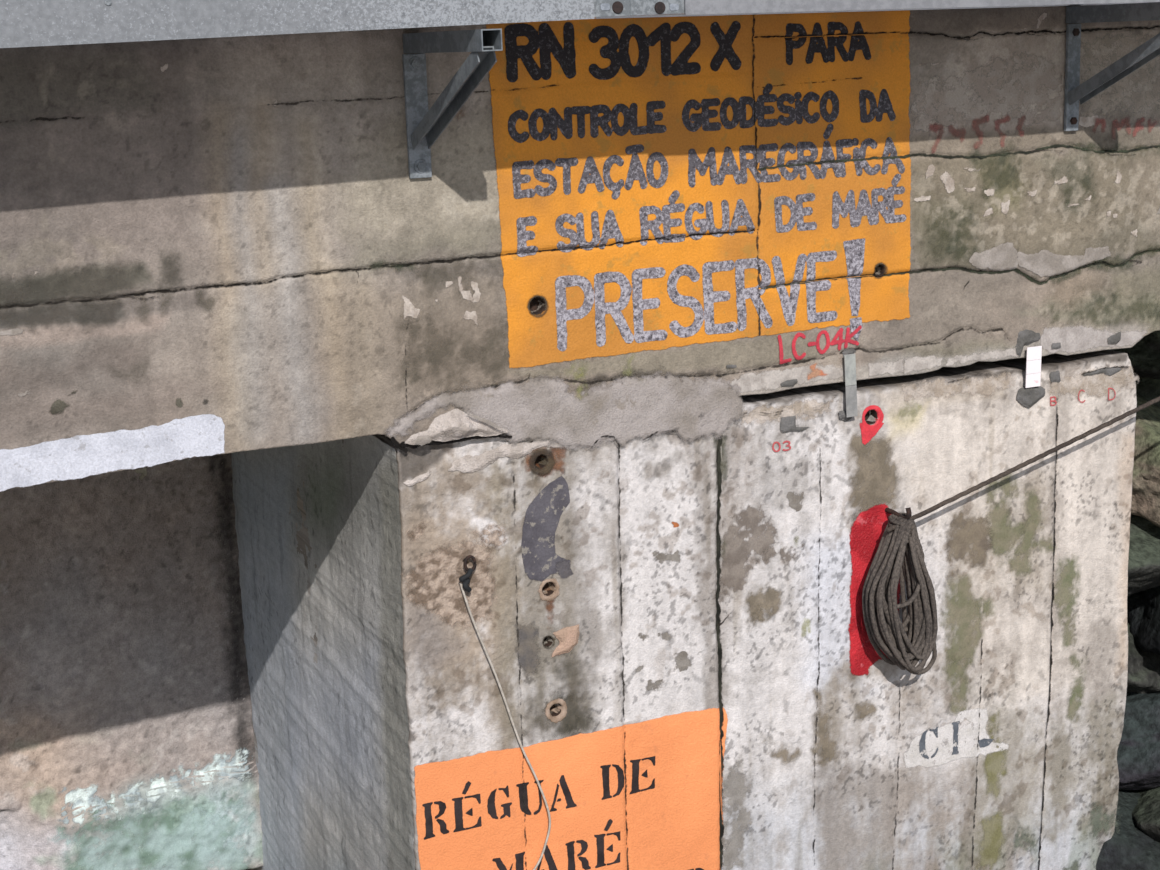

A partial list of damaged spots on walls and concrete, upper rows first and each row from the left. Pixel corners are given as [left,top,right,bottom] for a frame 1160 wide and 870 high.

crack [0,15,1160,335]
spalling [969,242,1111,277]
crack [563,327,1010,384]
crack [385,349,530,453]
spalling [404,471,431,487]
spalling [405,409,561,473]
rust [526,447,564,476]
water stain [947,513,993,576]
water stain [987,474,1053,574]
water stain [946,660,968,713]
water stain [1067,679,1083,719]
water stain [976,813,1034,868]